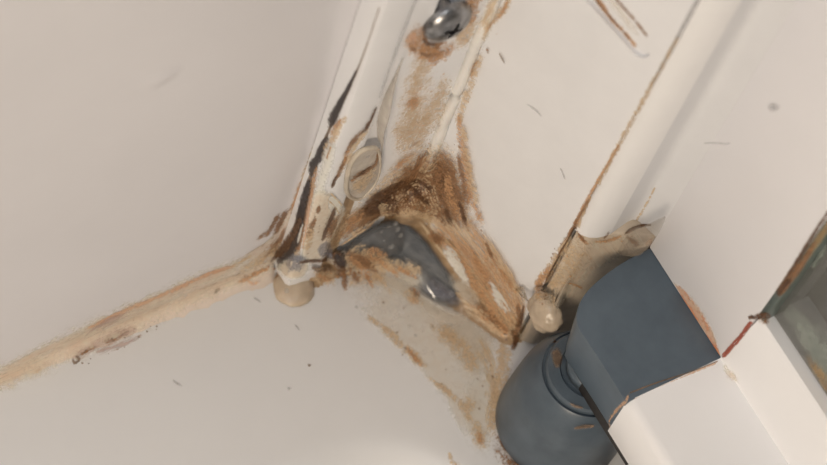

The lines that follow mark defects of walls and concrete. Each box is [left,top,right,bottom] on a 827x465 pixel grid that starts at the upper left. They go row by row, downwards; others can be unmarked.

rust [405,0,510,125]
rust [595,0,637,47]
crack [275,7,380,268]
leakage [300,107,484,303]
rust [424,38,678,350]
leakage [72,315,157,364]
leakage [368,317,426,367]
leakage [431,325,511,447]